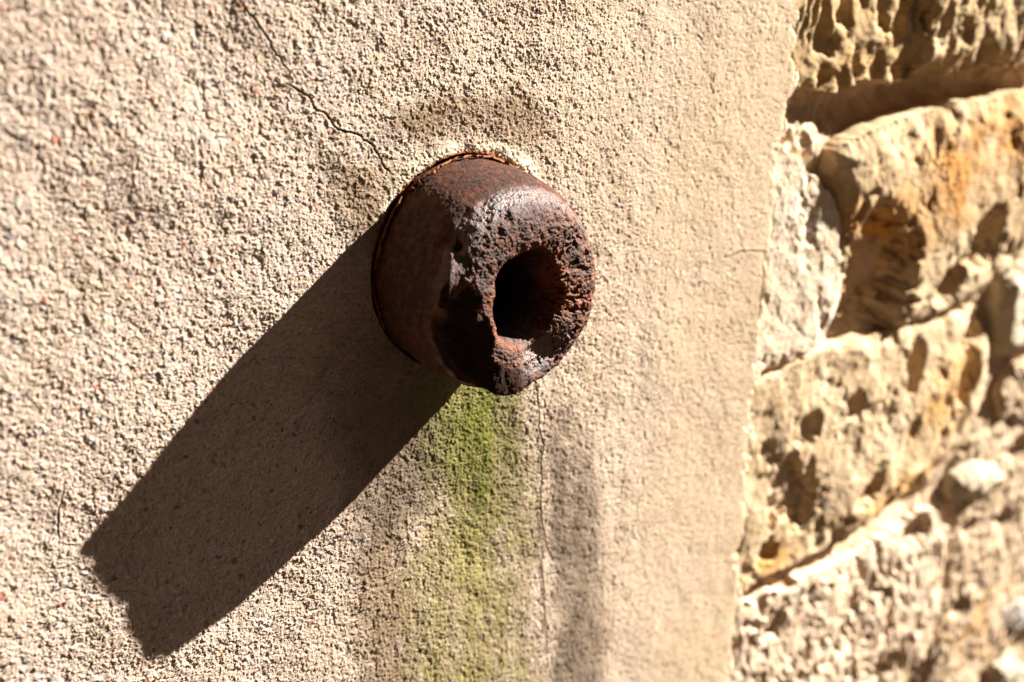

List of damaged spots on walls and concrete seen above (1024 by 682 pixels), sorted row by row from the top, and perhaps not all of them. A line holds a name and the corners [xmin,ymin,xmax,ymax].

crack [239,0,390,172]
corrosion [370,151,517,299]
water stain [348,371,527,682]